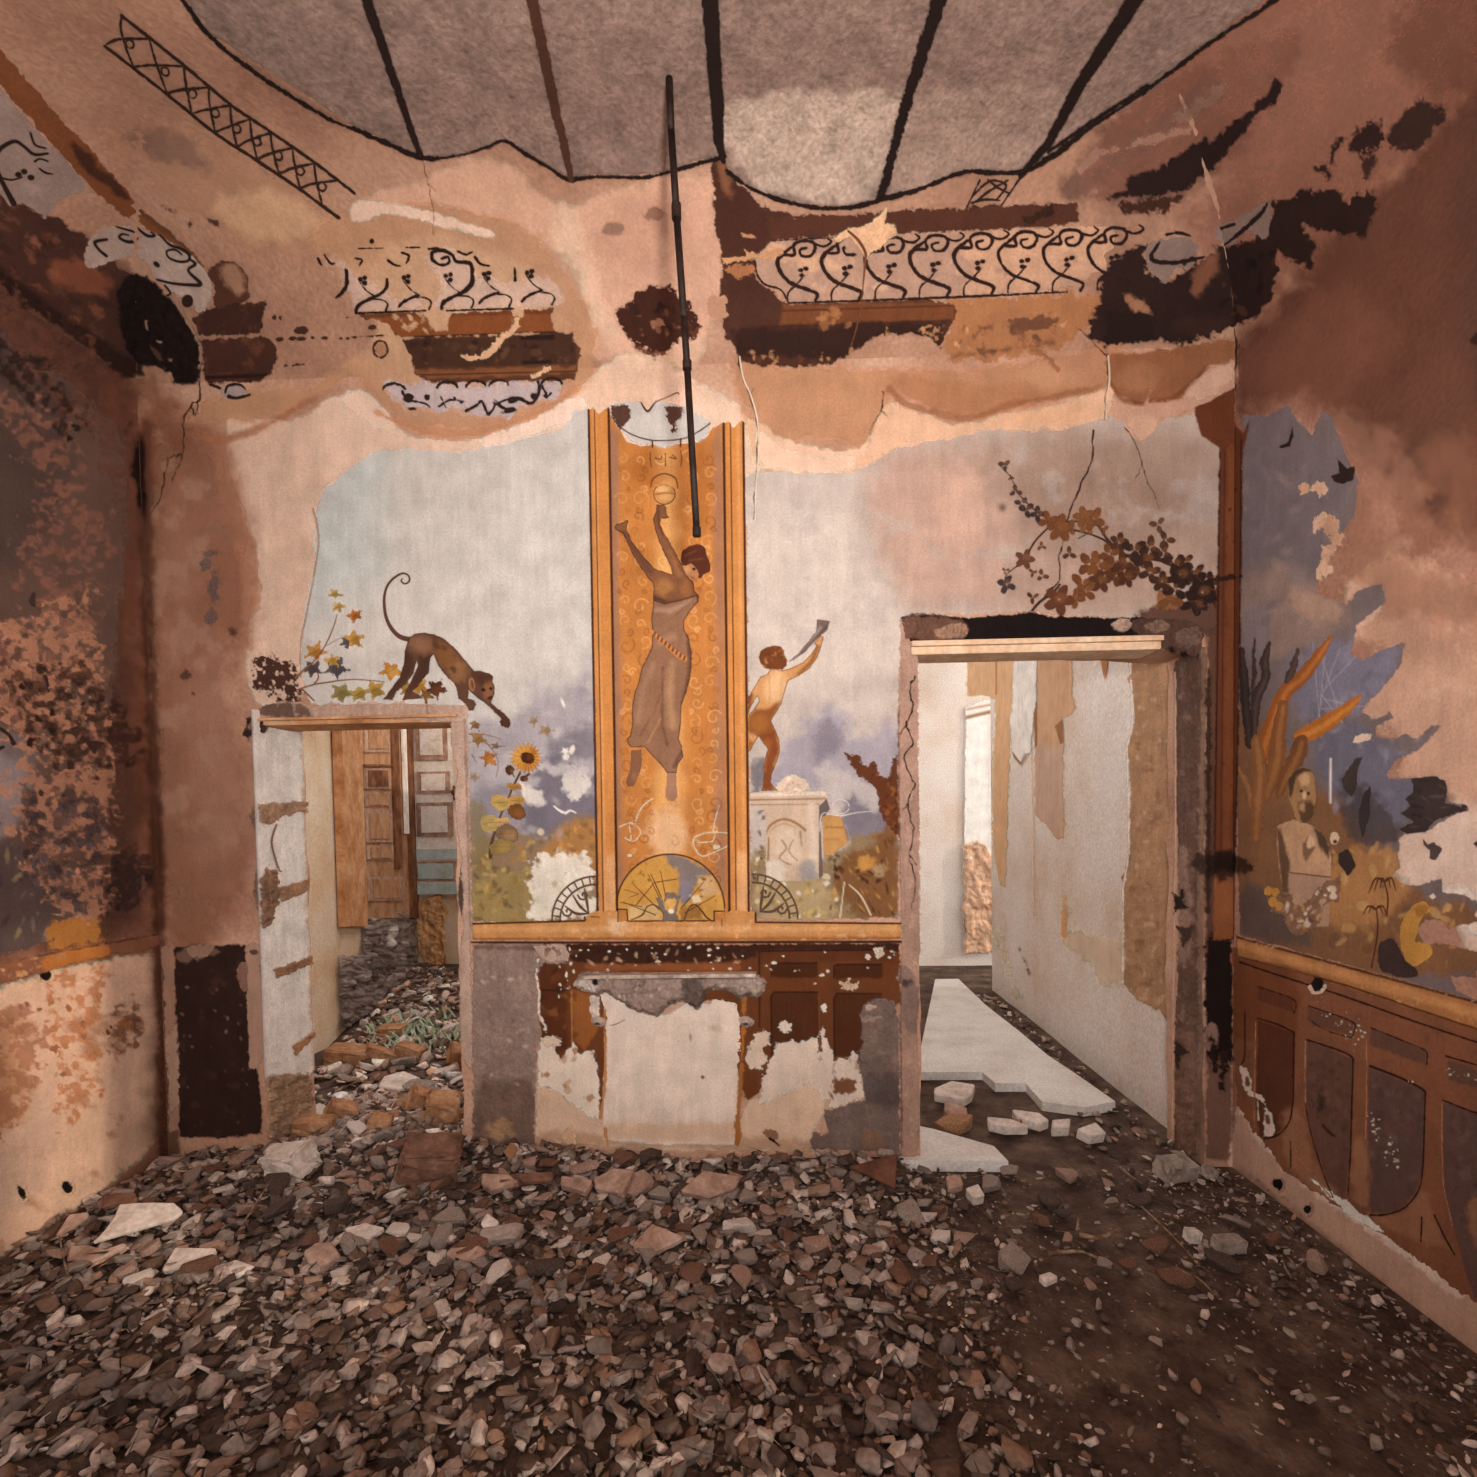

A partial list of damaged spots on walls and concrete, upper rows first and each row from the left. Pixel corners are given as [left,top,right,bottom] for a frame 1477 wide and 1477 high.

spalling [116,273,202,385]
leakage [733,0,1477,529]
peeling [0,578,128,921]
leakage [0,130,596,1156]
spalling [180,0,1279,1157]
peeling [1298,481,1344,580]
peeling [1347,550,1477,952]
peeling [0,944,214,1256]